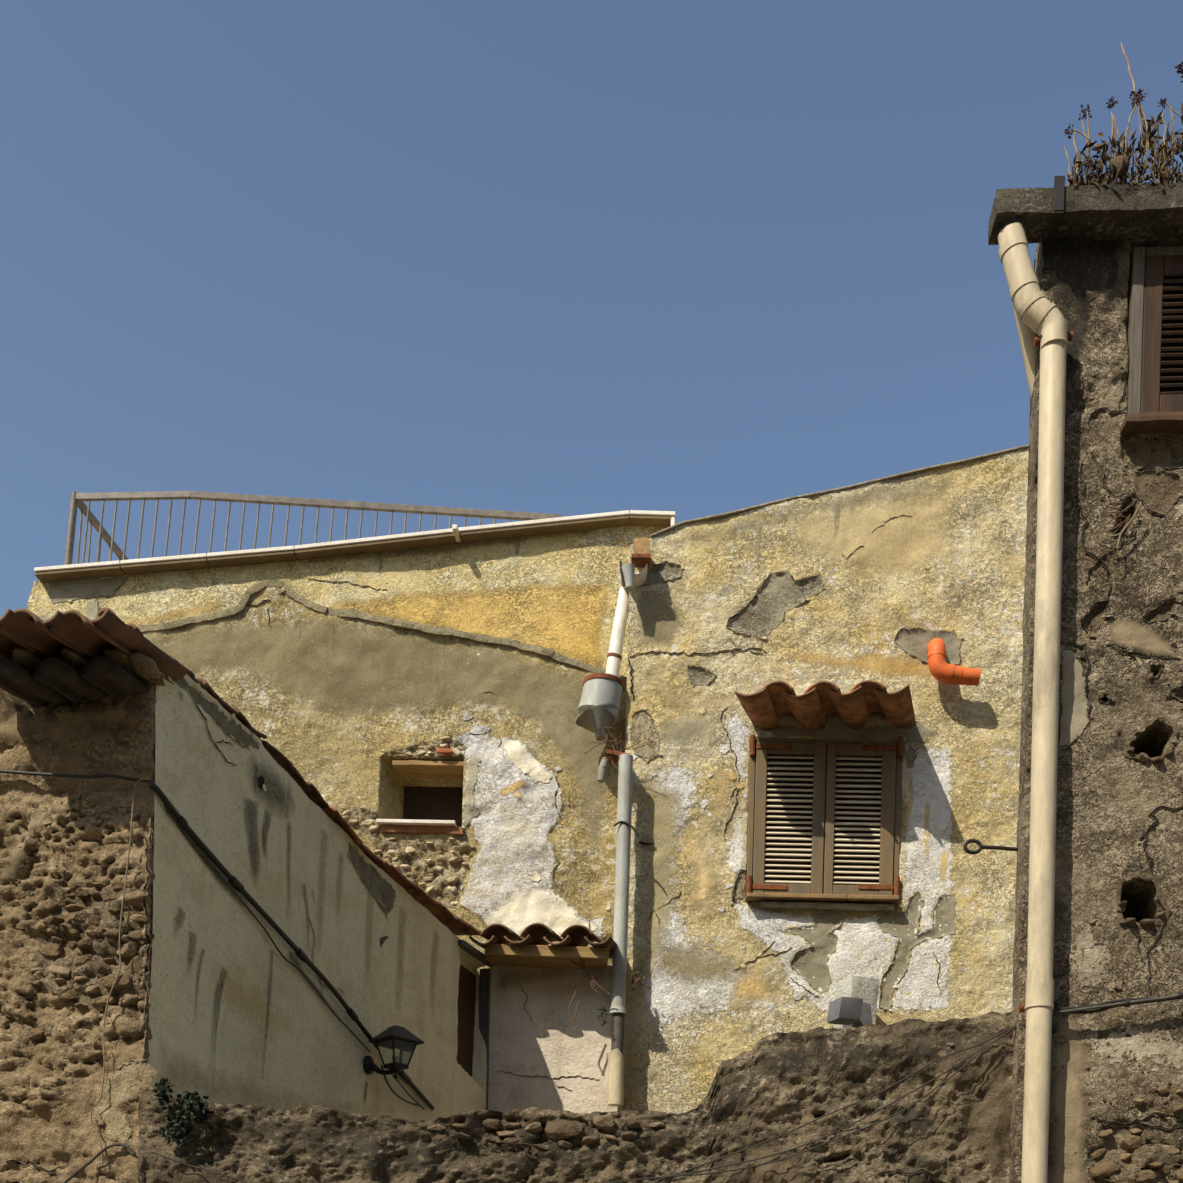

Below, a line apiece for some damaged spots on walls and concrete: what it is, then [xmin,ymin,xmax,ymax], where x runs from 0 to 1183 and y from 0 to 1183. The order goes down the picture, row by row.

crack [160,672,237,766]
crack [246,578,387,628]
spalling [688,665,718,686]
spalling [726,571,825,640]
spalling [893,627,963,665]
spalling [1058,650,1114,751]
water stain [245,768,289,873]
flaking render [339,712,611,938]
crack [720,707,740,841]
flaking render [630,709,956,1037]
crack [1139,805,1183,874]
crack [1089,1110,1183,1131]